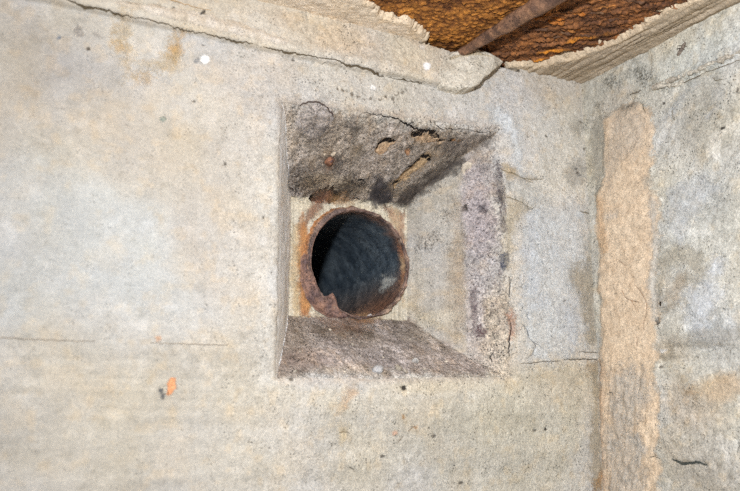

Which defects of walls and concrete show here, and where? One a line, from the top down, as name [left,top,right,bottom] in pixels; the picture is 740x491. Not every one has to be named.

crack [69,0,422,84]
corrosion [455,0,592,56]
spalling [375,137,396,154]
spalling [392,132,442,189]
corrosion [297,193,331,316]
crack [489,314,597,364]
crack [652,456,708,468]